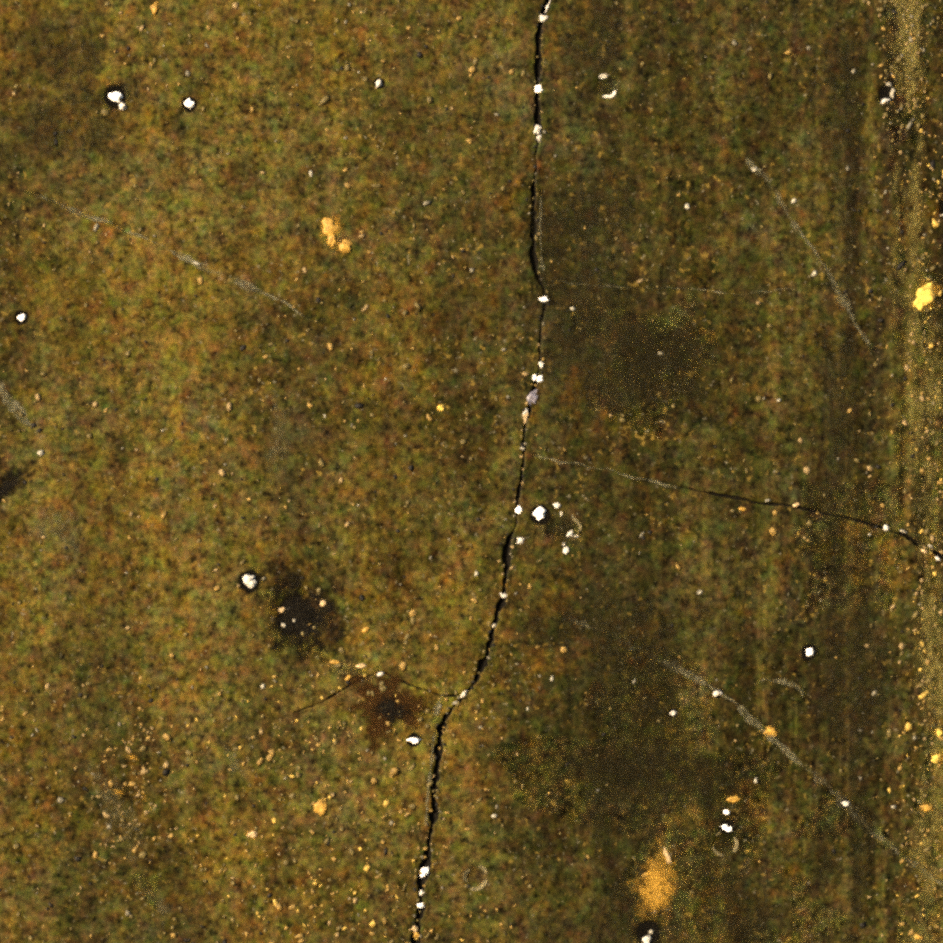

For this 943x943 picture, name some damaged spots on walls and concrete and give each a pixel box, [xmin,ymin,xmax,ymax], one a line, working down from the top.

crack [828,273,869,342]
crack [295,0,578,943]
crack [610,469,943,563]
damp [259,563,436,748]
crack [663,661,801,764]